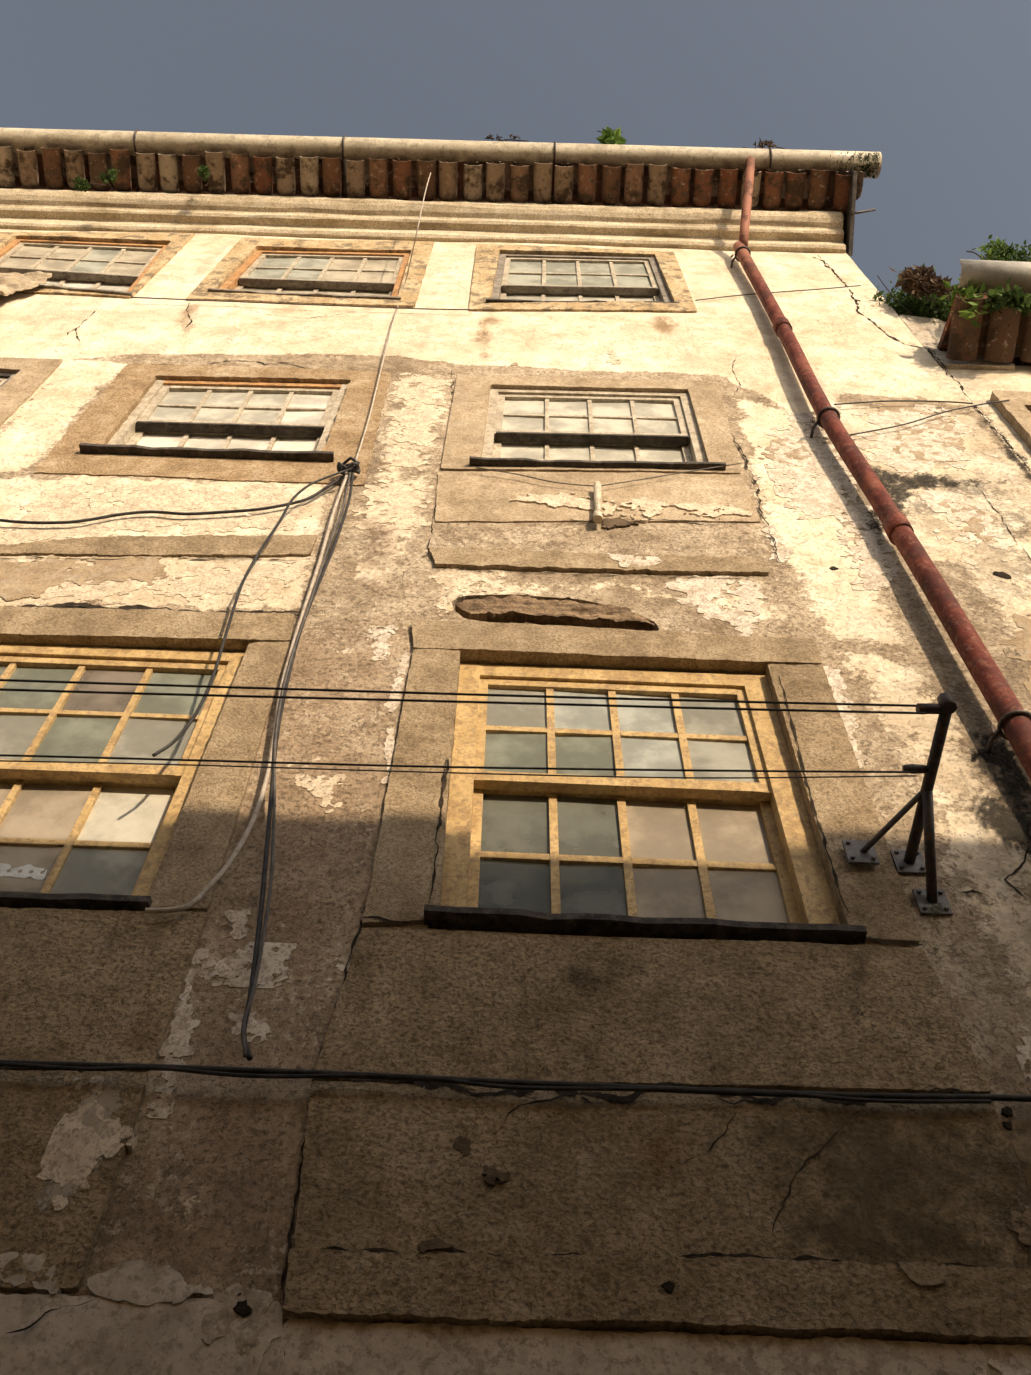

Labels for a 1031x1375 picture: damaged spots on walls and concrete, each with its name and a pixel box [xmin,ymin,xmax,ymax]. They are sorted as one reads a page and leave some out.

crack [814,255,1031,471]
peeling [0,481,312,605]
peeling [346,372,456,552]
leakage [864,508,883,546]
leakage [872,466,1006,514]
leakage [977,406,1031,479]
peeling [665,575,768,637]
leakage [962,729,1031,859]
peeling [145,903,297,1119]
crack [281,758,880,1304]
crack [925,1086,965,1094]
crack [941,1261,988,1269]